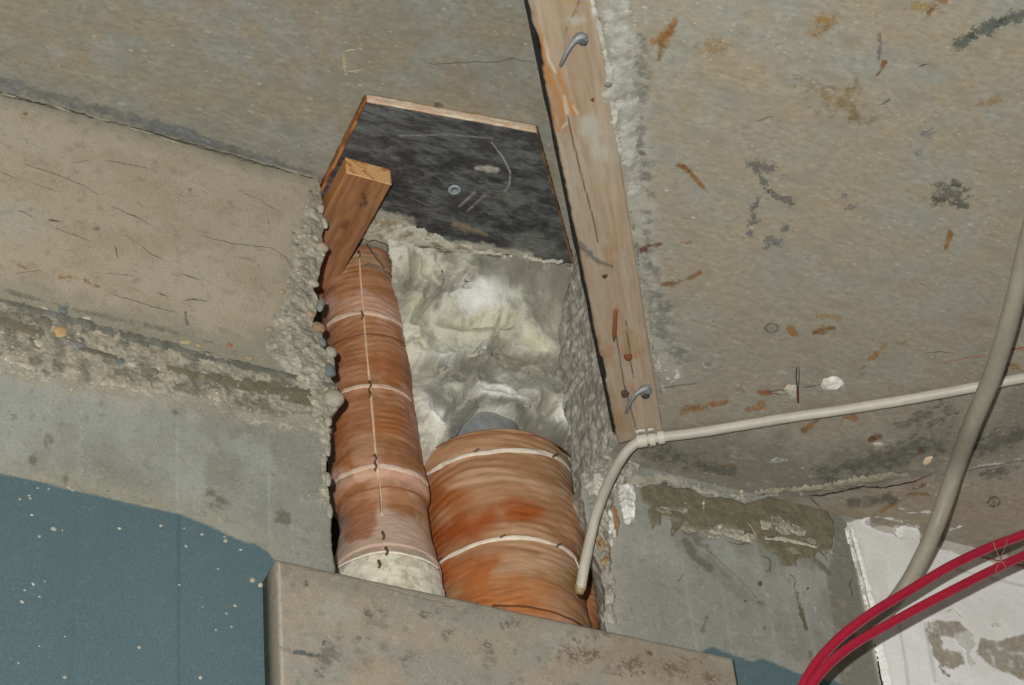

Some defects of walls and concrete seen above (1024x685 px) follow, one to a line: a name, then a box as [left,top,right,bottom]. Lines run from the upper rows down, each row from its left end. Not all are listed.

rust [651,19,677,60]
leakage [954,8,1024,48]
leakage [746,162,794,235]
leakage [932,179,970,209]
spalling [0,180,345,519]
crack [753,458,1023,507]
peeling [656,506,818,555]